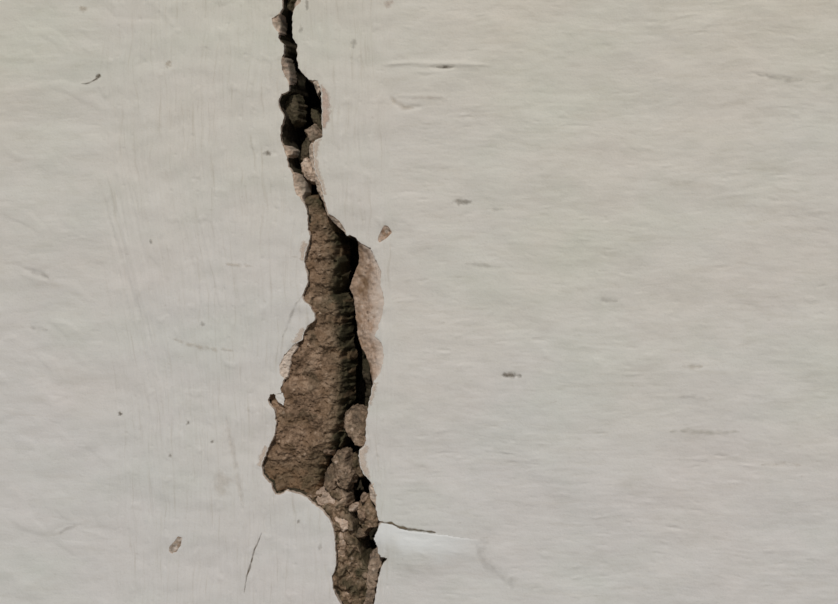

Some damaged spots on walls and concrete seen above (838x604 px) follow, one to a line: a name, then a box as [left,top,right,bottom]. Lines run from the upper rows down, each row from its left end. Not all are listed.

crack [258,0,436,604]
peeling [379,225,392,242]